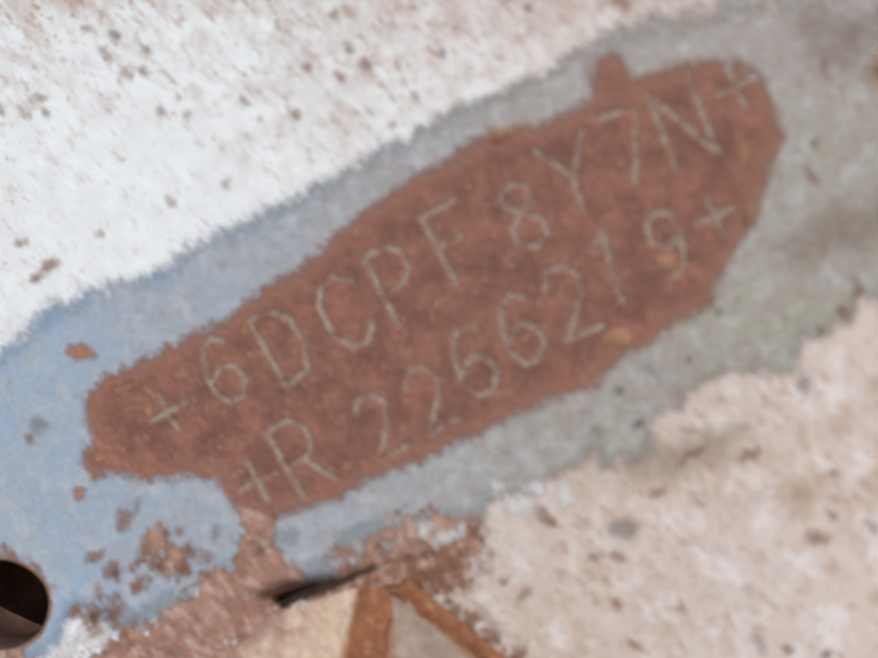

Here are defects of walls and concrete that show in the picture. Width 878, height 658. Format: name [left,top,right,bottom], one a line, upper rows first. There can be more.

rust [71,54,784,658]
peeling [338,524,372,544]
peeling [432,524,466,546]
peeling [309,557,330,580]
peeling [76,625,111,651]
rust [0,648,37,658]